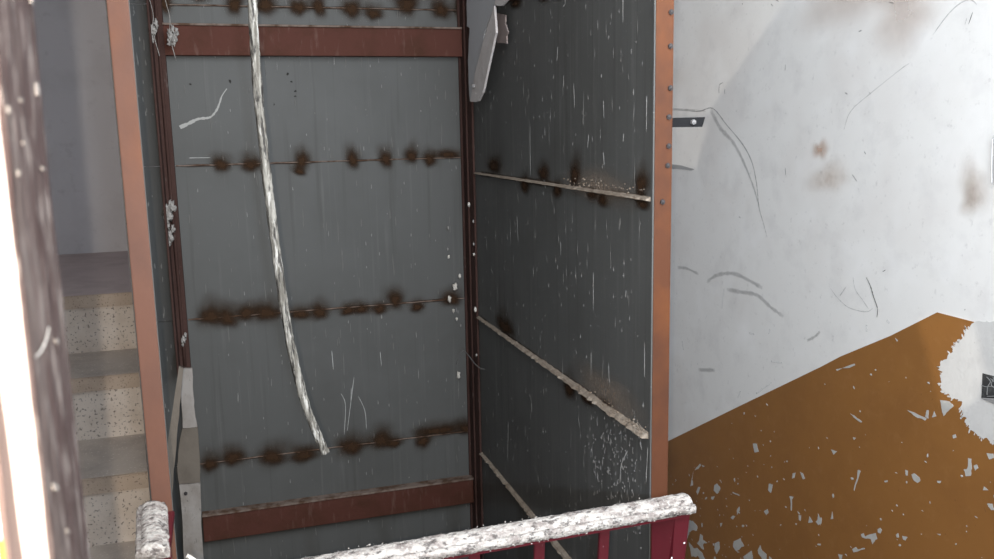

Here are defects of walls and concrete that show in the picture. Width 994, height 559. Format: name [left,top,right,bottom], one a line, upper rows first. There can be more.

rust [258,0,382,19]
rust [342,151,391,166]
rust [405,149,457,166]
crack [672,163,694,171]
rust [588,176,647,209]
rust [200,291,458,325]
peeling [909,321,994,459]
rust [203,423,468,470]
peeling [961,458,978,477]
peeling [687,464,772,559]
peeling [785,496,833,547]
peeling [838,518,882,559]